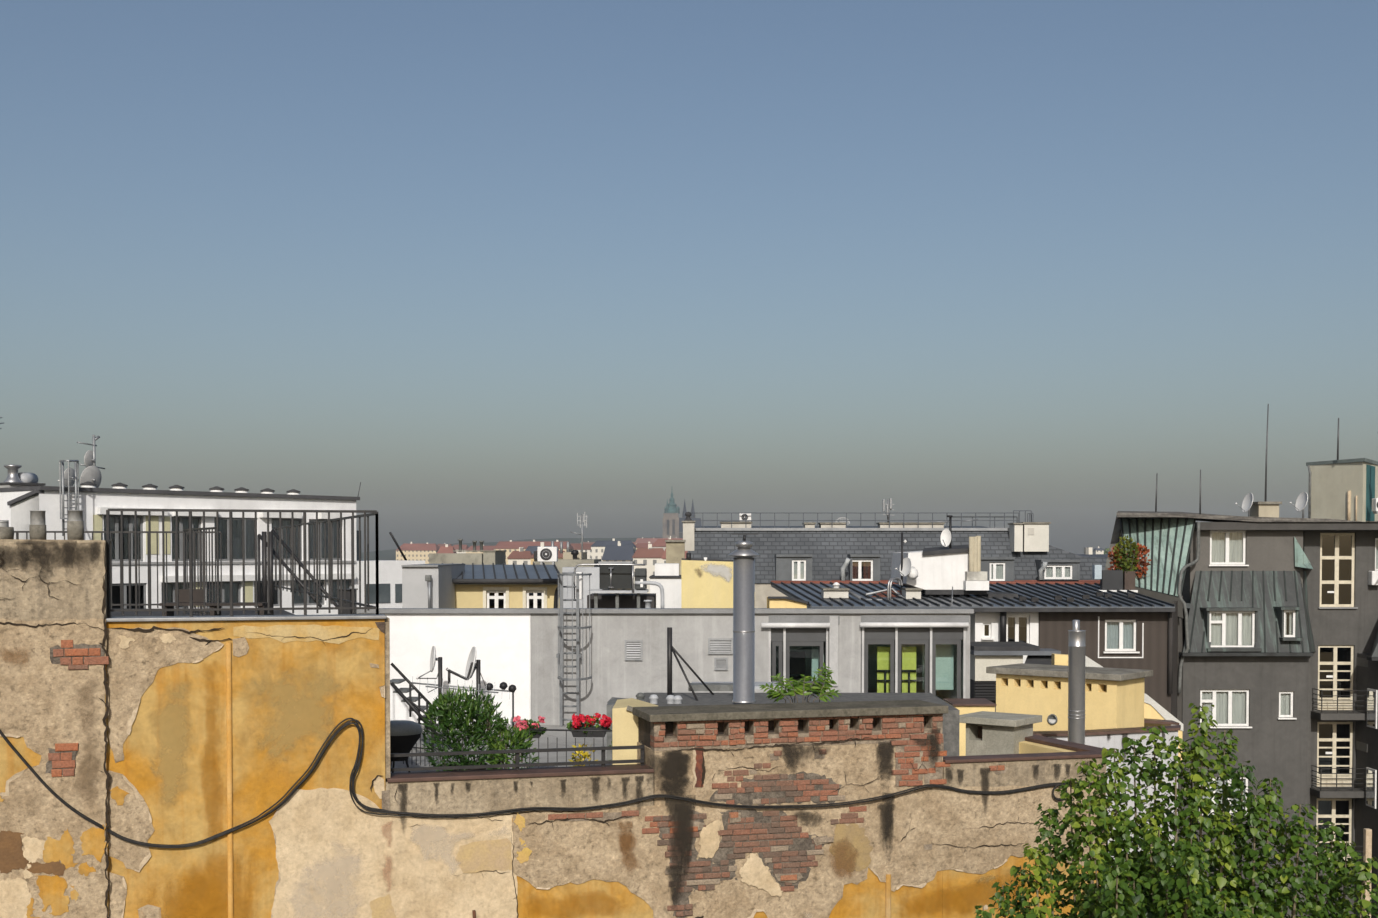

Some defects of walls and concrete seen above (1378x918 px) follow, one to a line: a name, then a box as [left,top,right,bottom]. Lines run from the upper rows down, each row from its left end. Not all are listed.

leakage [0,540,99,568]
crack [0,543,372,918]
flaking render [0,618,385,918]
leakage [399,783,407,820]
leakage [592,750,696,901]
flaking render [269,734,1106,918]
leakage [877,741,895,773]
leakage [878,793,894,839]